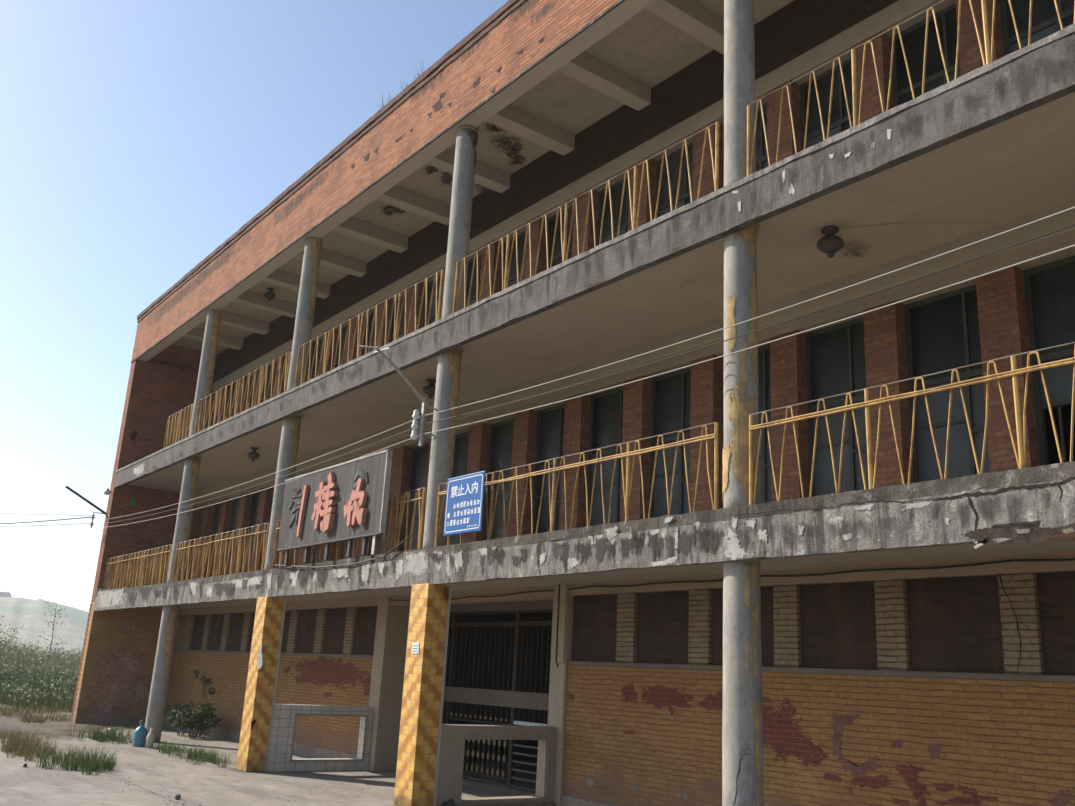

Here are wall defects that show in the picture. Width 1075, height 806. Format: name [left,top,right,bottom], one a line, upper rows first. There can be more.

water stain [486,124,526,165]
peeling [722,225,758,505]
crack [729,477,1075,530]
peeling [901,500,933,511]
water stain [960,500,991,526]
water stain [431,524,726,574]
peeling [719,517,767,686]
peeling [283,656,371,697]
peeling [621,683,723,715]
peeling [735,697,998,806]
crack [733,753,754,806]